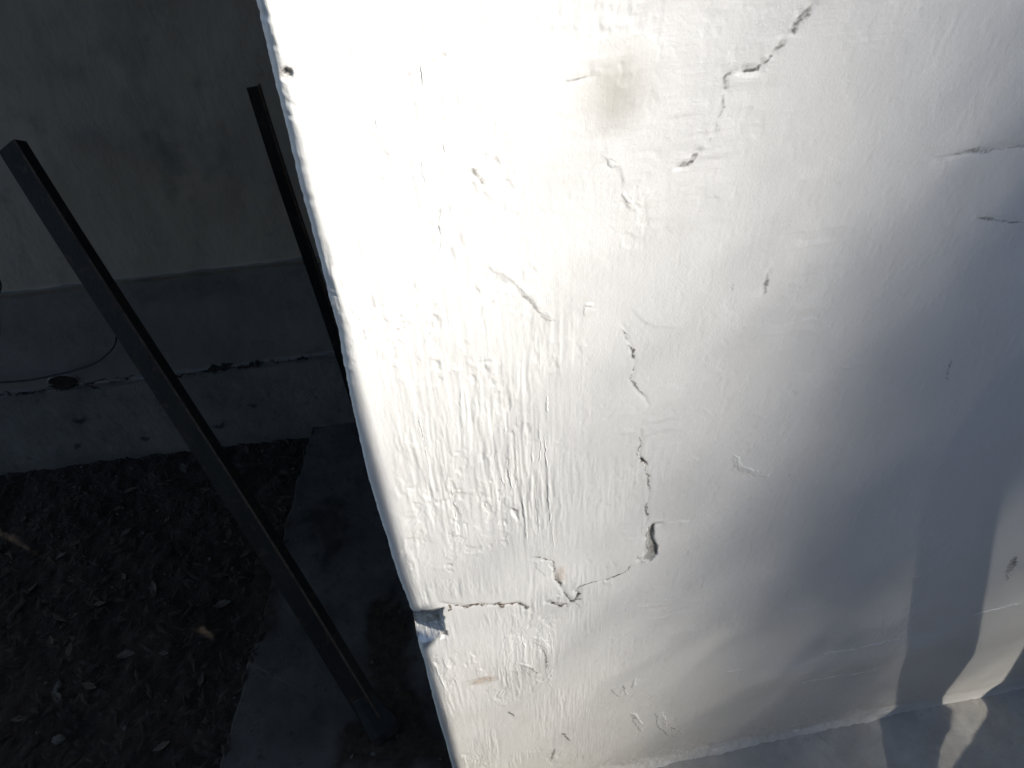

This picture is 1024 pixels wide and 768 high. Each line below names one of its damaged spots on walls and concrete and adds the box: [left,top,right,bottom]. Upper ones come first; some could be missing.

crack [723,10,809,103]
spalling [642,524,657,562]
crack [448,552,644,611]
spalling [409,604,447,638]